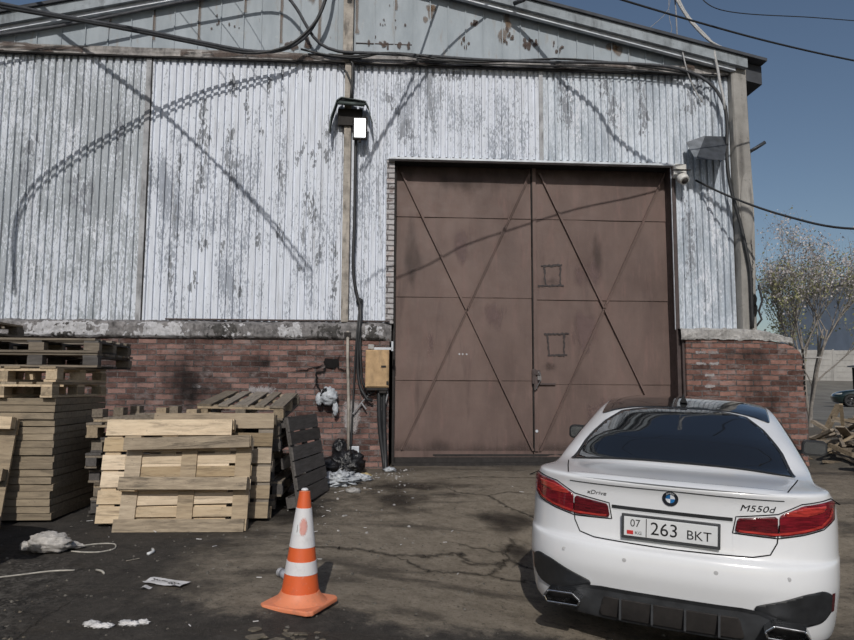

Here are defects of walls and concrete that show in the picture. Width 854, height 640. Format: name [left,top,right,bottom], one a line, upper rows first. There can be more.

corrosion [368,40,443,64]
peeling [225,72,252,124]
peeling [380,82,414,144]
peeling [548,74,586,148]
peeling [595,75,652,154]
peeling [65,173,110,245]
peeling [166,91,242,296]
peeling [681,173,729,315]
peeling [24,320,109,338]
peeling [123,321,254,339]
peeling [271,322,343,340]
spalling [362,324,386,341]